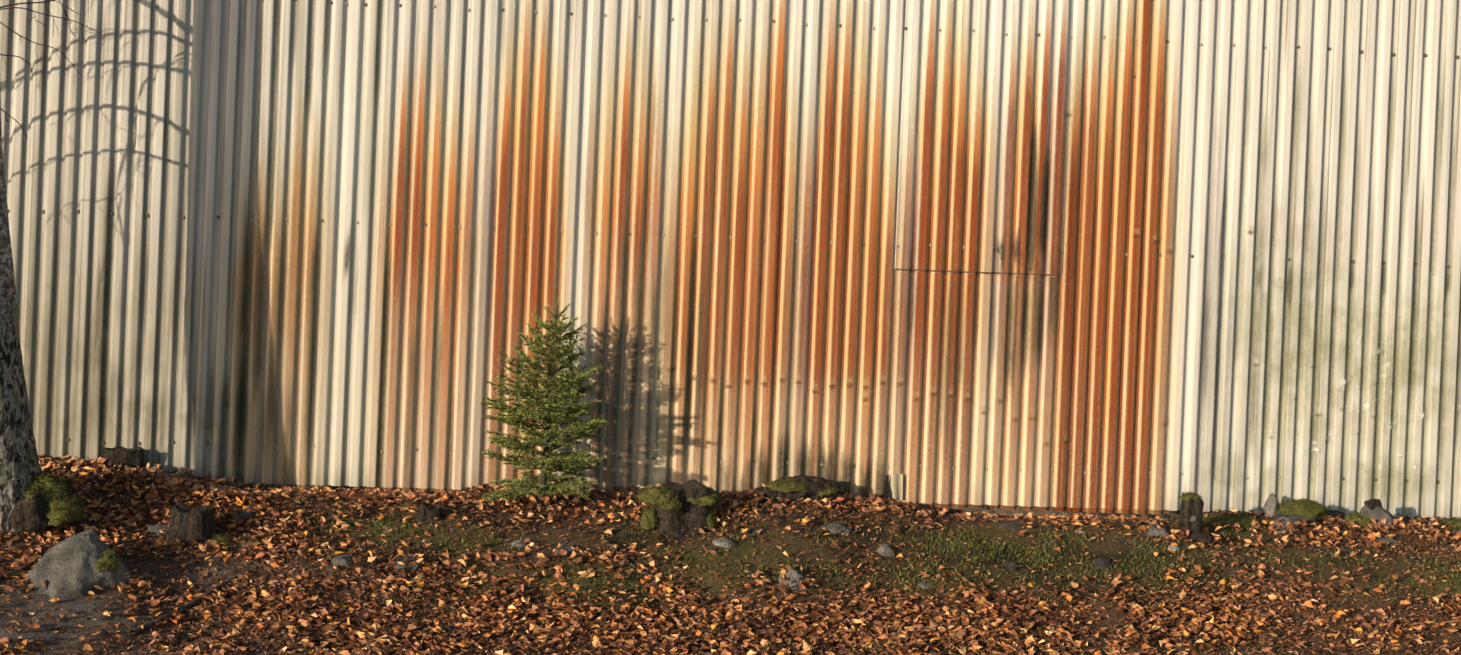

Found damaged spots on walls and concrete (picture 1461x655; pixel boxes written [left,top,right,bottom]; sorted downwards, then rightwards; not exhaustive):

rust [389,87,472,407]
rust [490,35,564,490]
rust [593,61,660,345]
rust [673,0,985,509]
water stain [1006,283,1054,366]
water stain [1039,158,1048,254]
rust [999,0,1172,514]